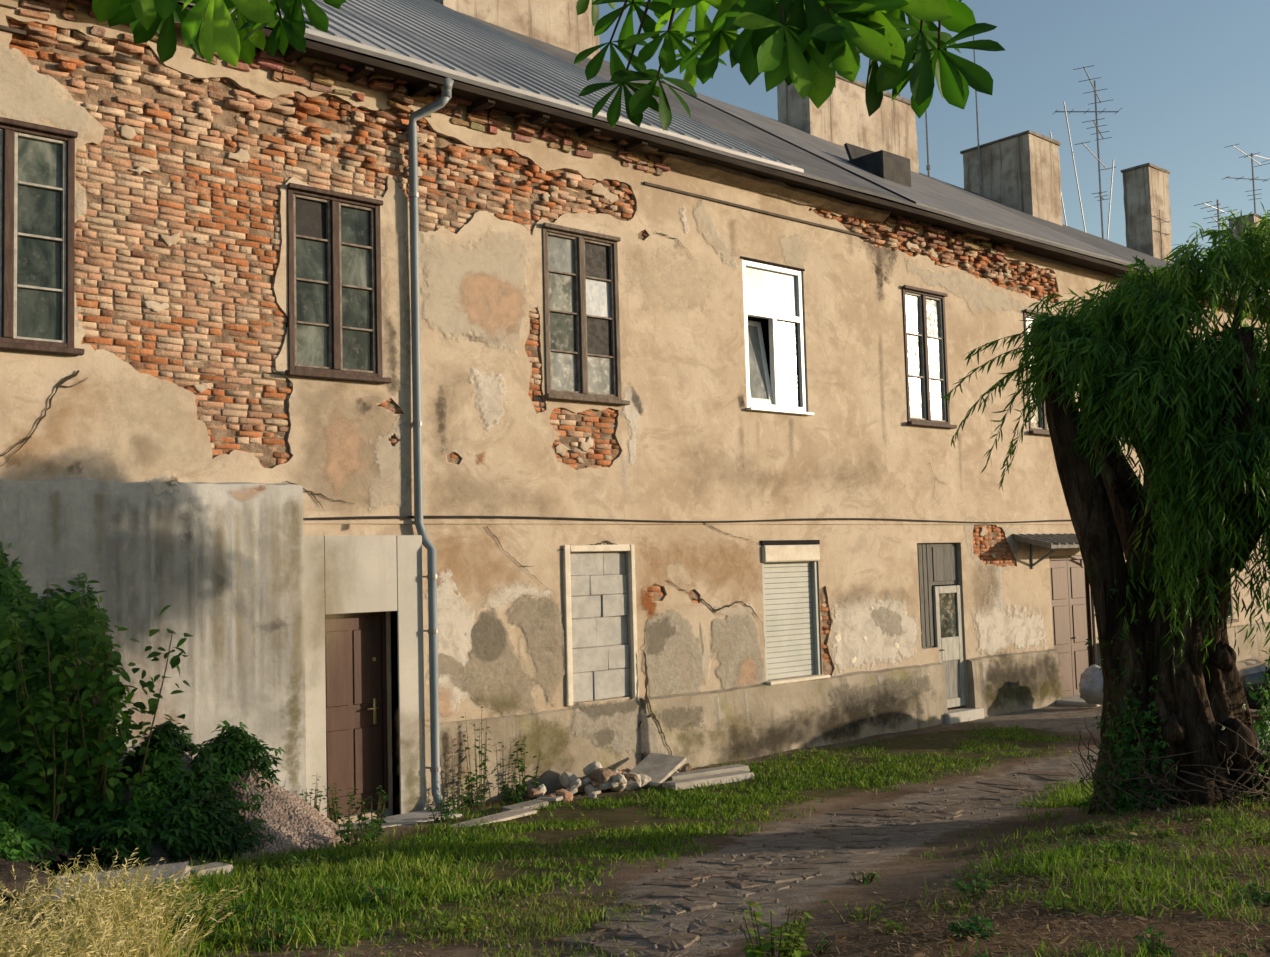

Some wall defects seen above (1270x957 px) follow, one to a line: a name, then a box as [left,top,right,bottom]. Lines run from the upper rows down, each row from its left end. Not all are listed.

flaking render [0,18,636,470]
flaking render [808,209,1060,305]
crack [0,370,88,467]
flaking render [427,570,550,720]
crack [636,630,672,755]
leakage [659,707,703,742]
crack [667,580,765,647]
spalling [819,587,833,675]
leakage [730,592,931,762]
flaking render [964,517,1046,655]
leakage [983,655,1058,702]